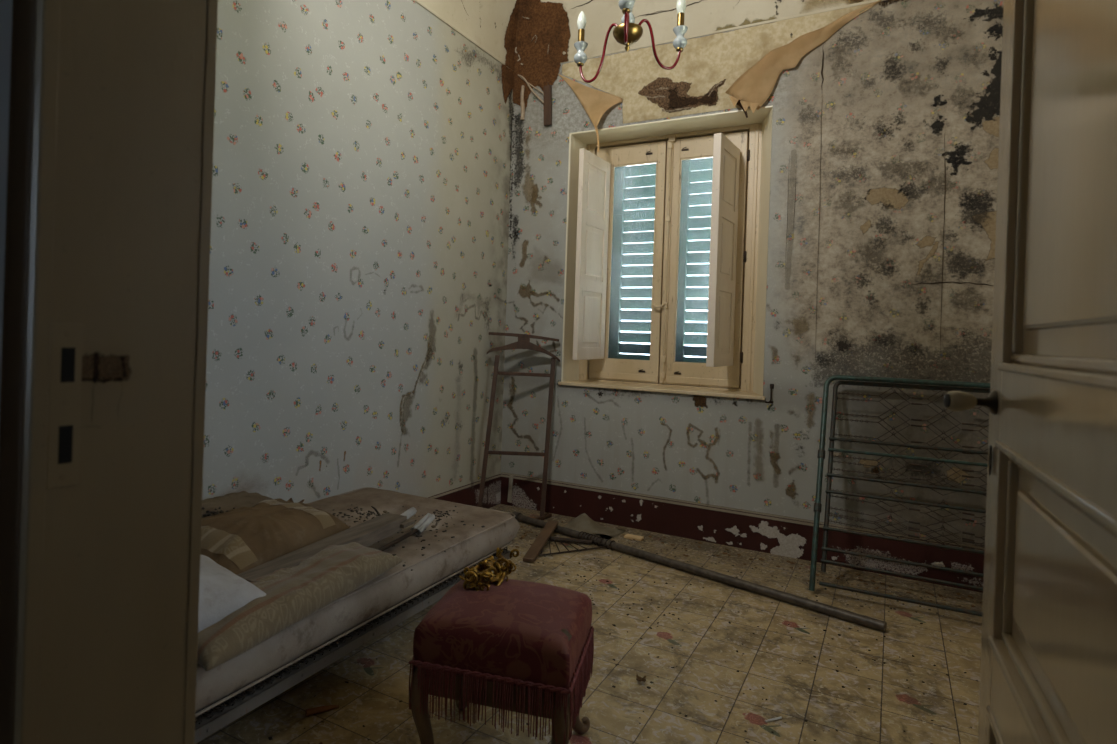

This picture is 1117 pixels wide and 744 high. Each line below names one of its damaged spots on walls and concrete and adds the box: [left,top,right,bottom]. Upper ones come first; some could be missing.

crack [635,0,702,18]
flaking render [501,0,881,152]
damp [964,3,1004,130]
damp [923,95,947,135]
damp [942,143,973,176]
damp [876,182,928,245]
damp [961,192,994,229]
damp [943,234,984,279]
damp [800,329,992,448]
peeling [474,480,540,510]
damp [770,453,796,499]
peeling [620,521,983,610]